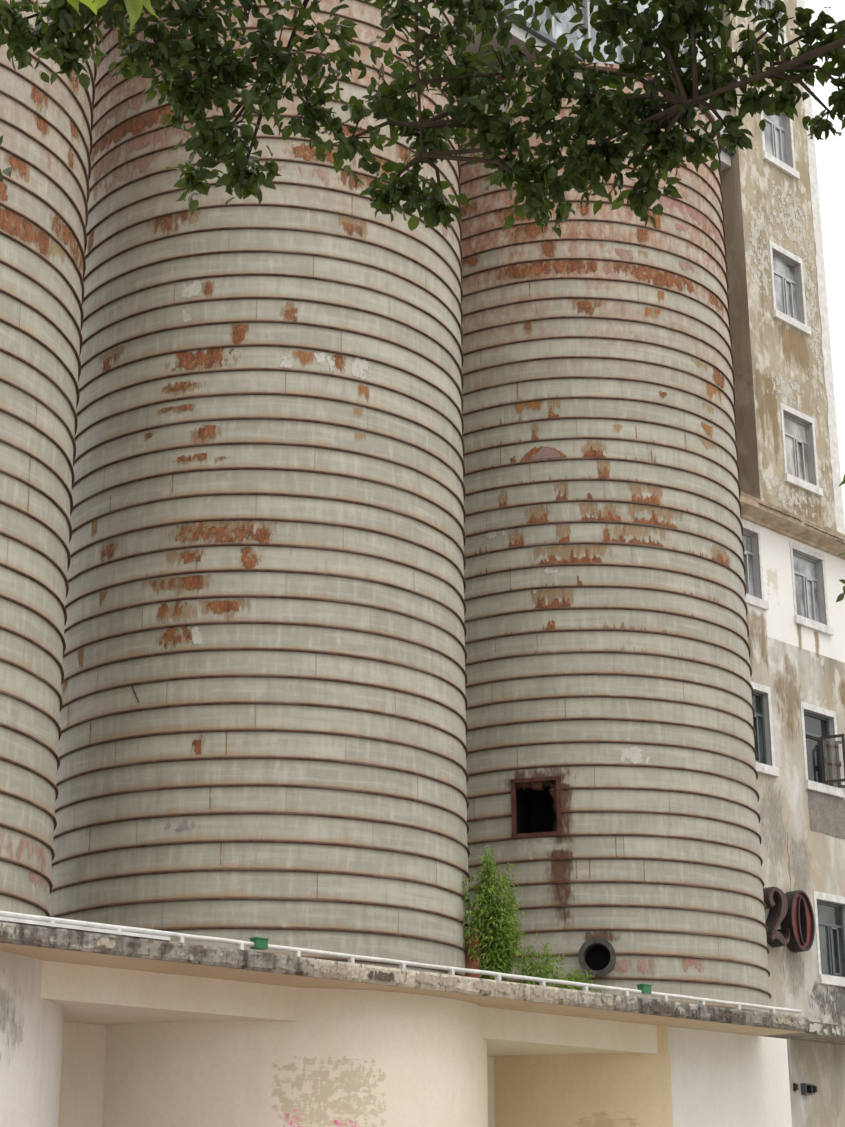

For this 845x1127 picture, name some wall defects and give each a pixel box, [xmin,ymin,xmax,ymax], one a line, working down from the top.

peeling [280,355,294,368]
peeling [314,352,371,380]
peeling [191,626,204,647]
corrosion [551,783,590,921]